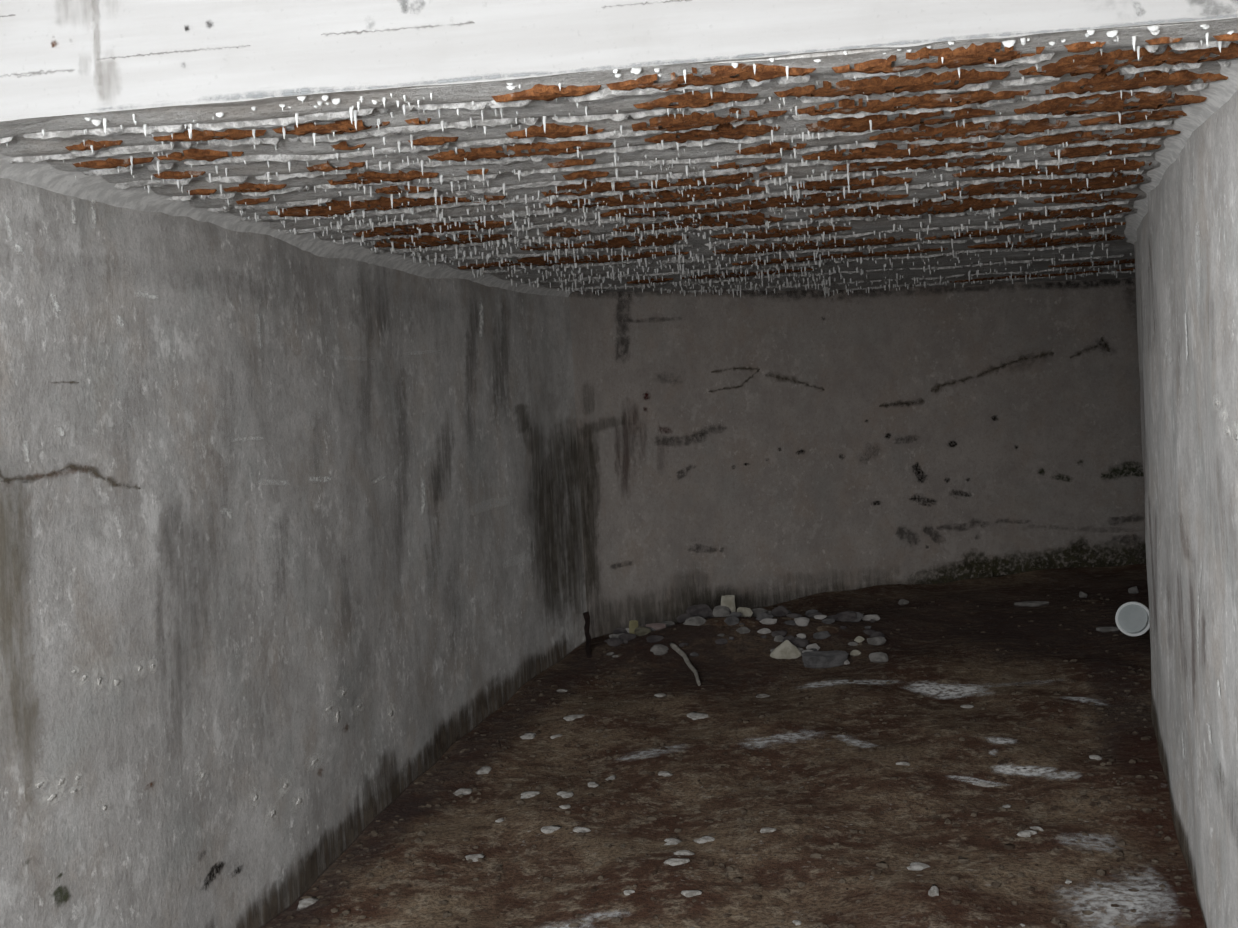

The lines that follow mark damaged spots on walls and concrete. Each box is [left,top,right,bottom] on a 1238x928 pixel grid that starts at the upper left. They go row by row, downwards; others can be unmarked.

water stain [0,10,1234,354]
crack [0,464,141,489]
water stain [531,431,597,601]